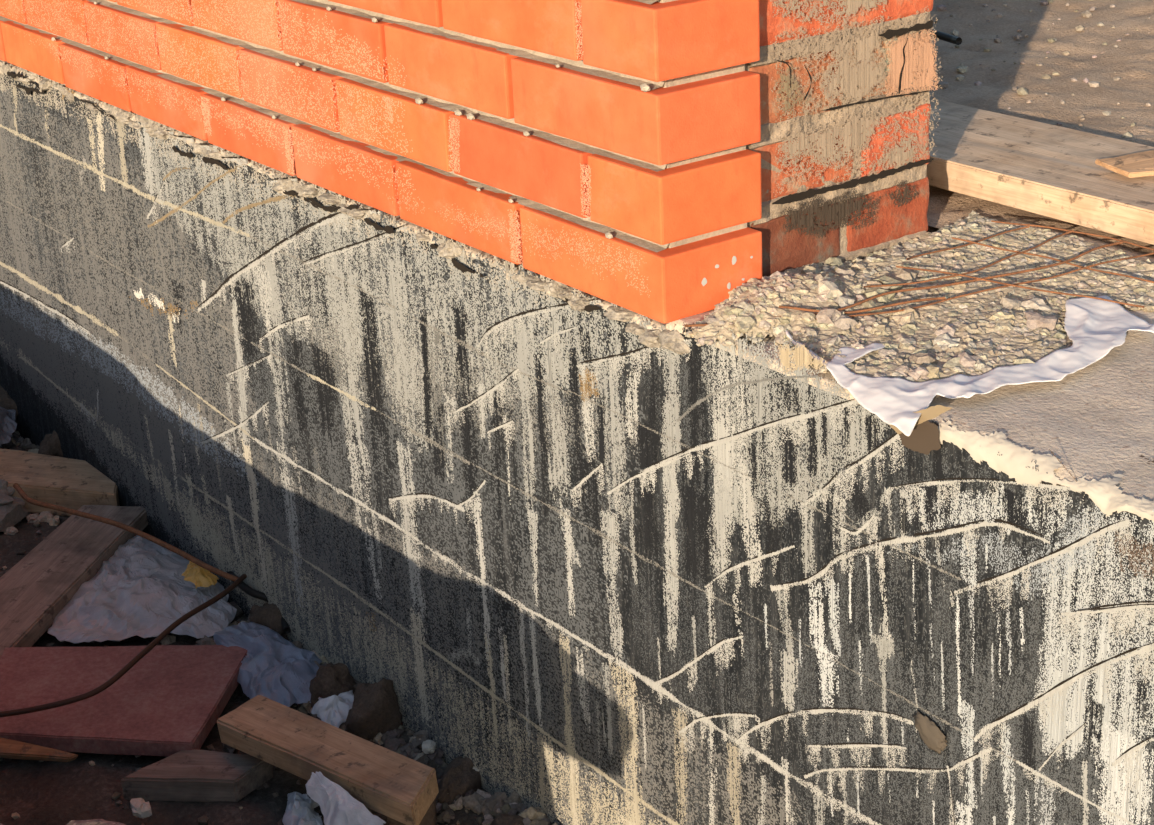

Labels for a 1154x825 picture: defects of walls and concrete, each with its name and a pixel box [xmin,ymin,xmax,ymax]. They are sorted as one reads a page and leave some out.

crack [80,99,118,123]
crack [777,20,937,111]
crack [772,159,934,205]
efflorescence [438,205,651,297]
crack [0,124,800,642]
spalling [889,405,1154,522]
spalling [1114,530,1154,581]